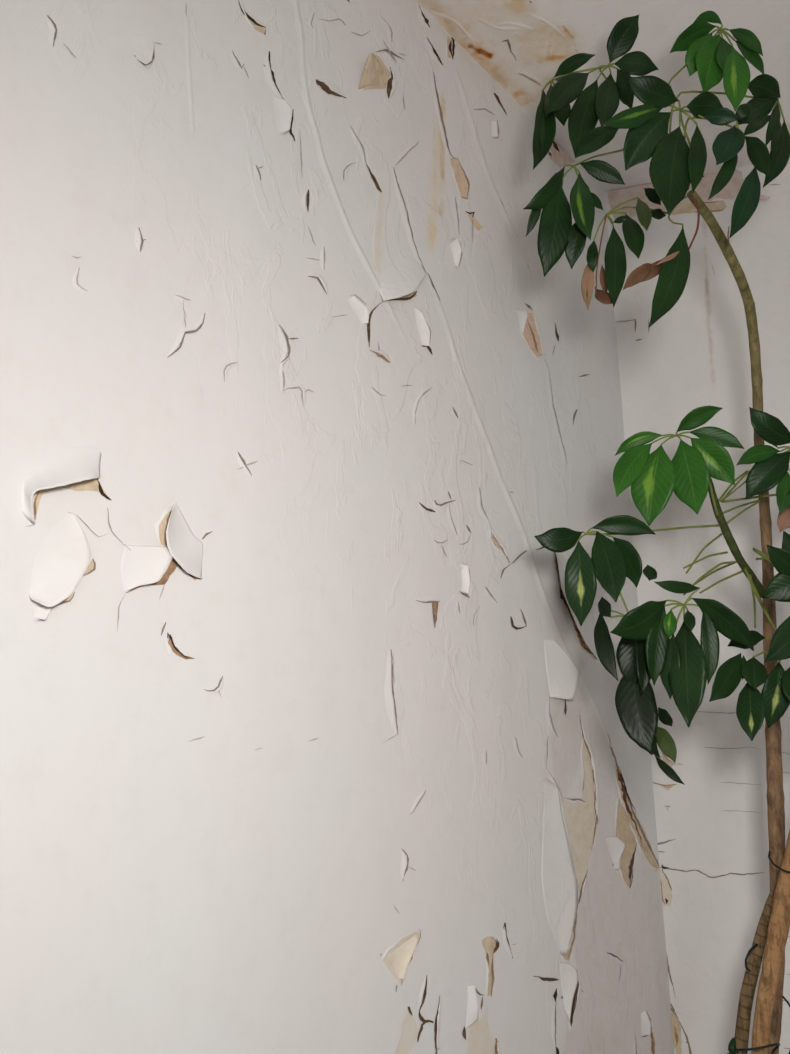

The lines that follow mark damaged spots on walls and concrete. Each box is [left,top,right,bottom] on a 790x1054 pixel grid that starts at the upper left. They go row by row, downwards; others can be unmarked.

peeling [238,0,295,141]
peeling [358,42,404,99]
peeling [431,72,484,268]
peeling [334,256,432,354]
peeling [22,446,213,631]
peeling [161,622,195,661]
peeling [554,552,598,660]
peeling [535,639,638,1036]
crack [657,839,765,878]
peeling [408,995,442,1054]
peeling [462,934,499,1040]
crack [666,945,677,1016]